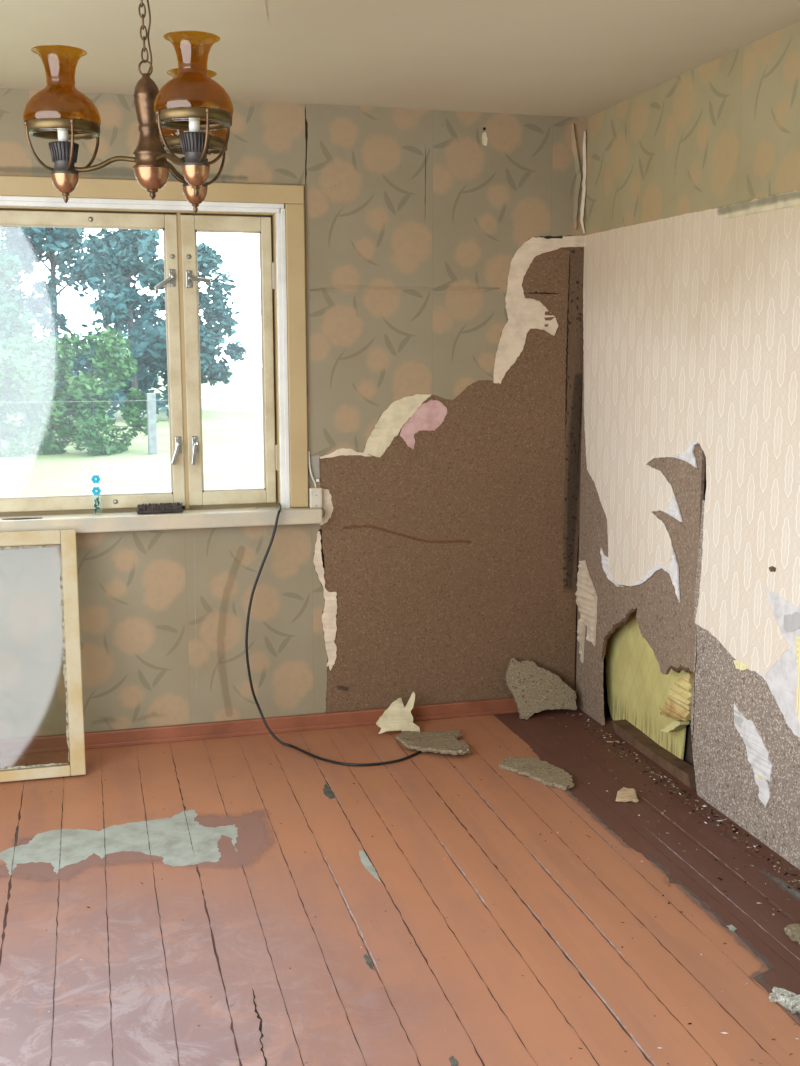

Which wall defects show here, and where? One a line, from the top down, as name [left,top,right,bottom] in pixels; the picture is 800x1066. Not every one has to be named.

spalling [602,607,696,788]
peeling [0,806,267,879]
crack [252,989,267,1066]